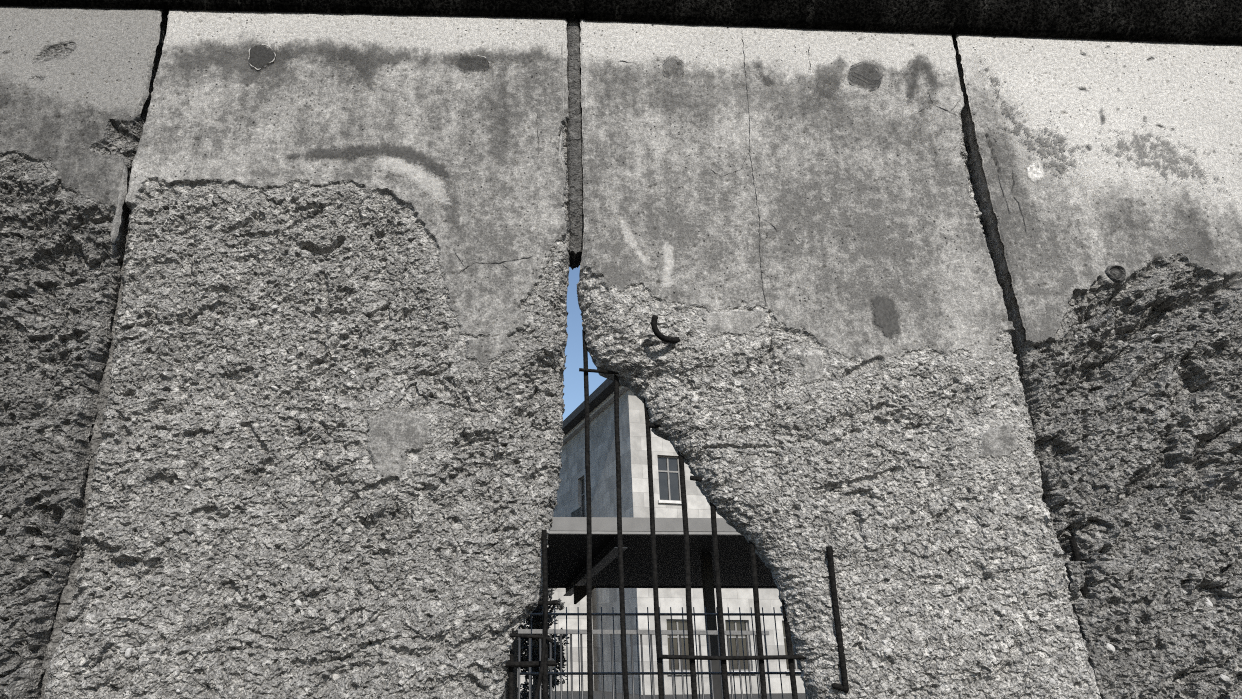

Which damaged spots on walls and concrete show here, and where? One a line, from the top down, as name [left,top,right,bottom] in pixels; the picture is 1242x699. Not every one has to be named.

spalling [0,116,571,699]
damp [871,295,901,338]
spalling [576,107,1242,699]
damp [906,58,938,101]